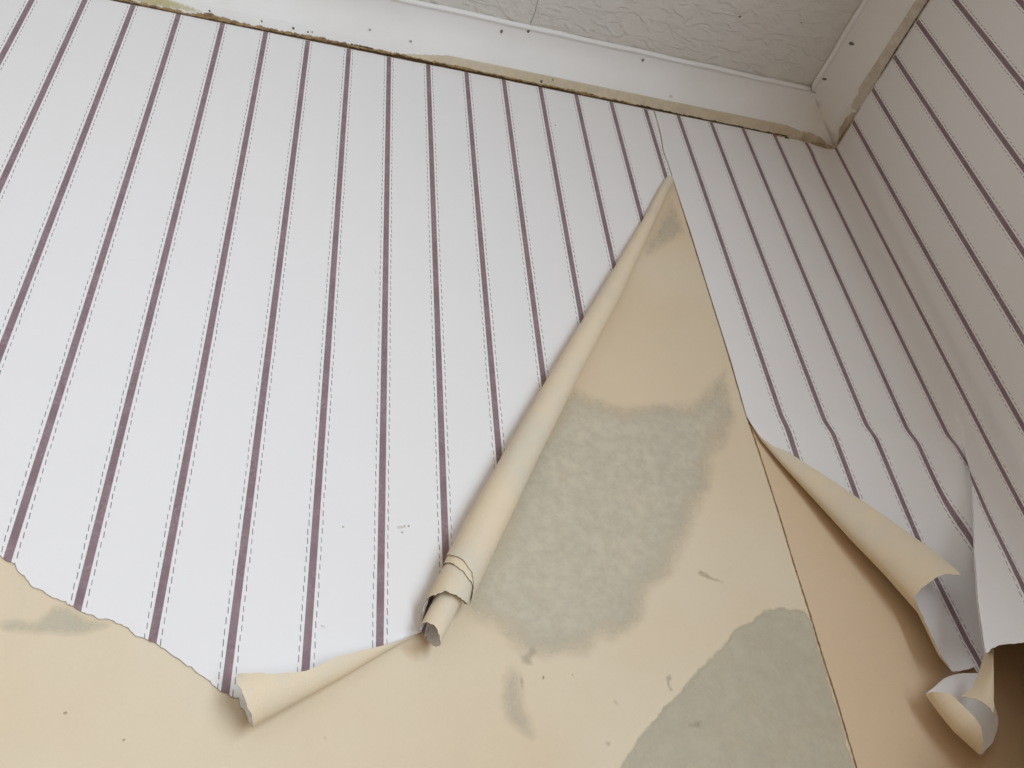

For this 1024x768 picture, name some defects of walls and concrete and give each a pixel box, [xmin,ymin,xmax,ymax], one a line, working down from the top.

leakage [474,387,729,659]
flaking render [623,608,855,768]